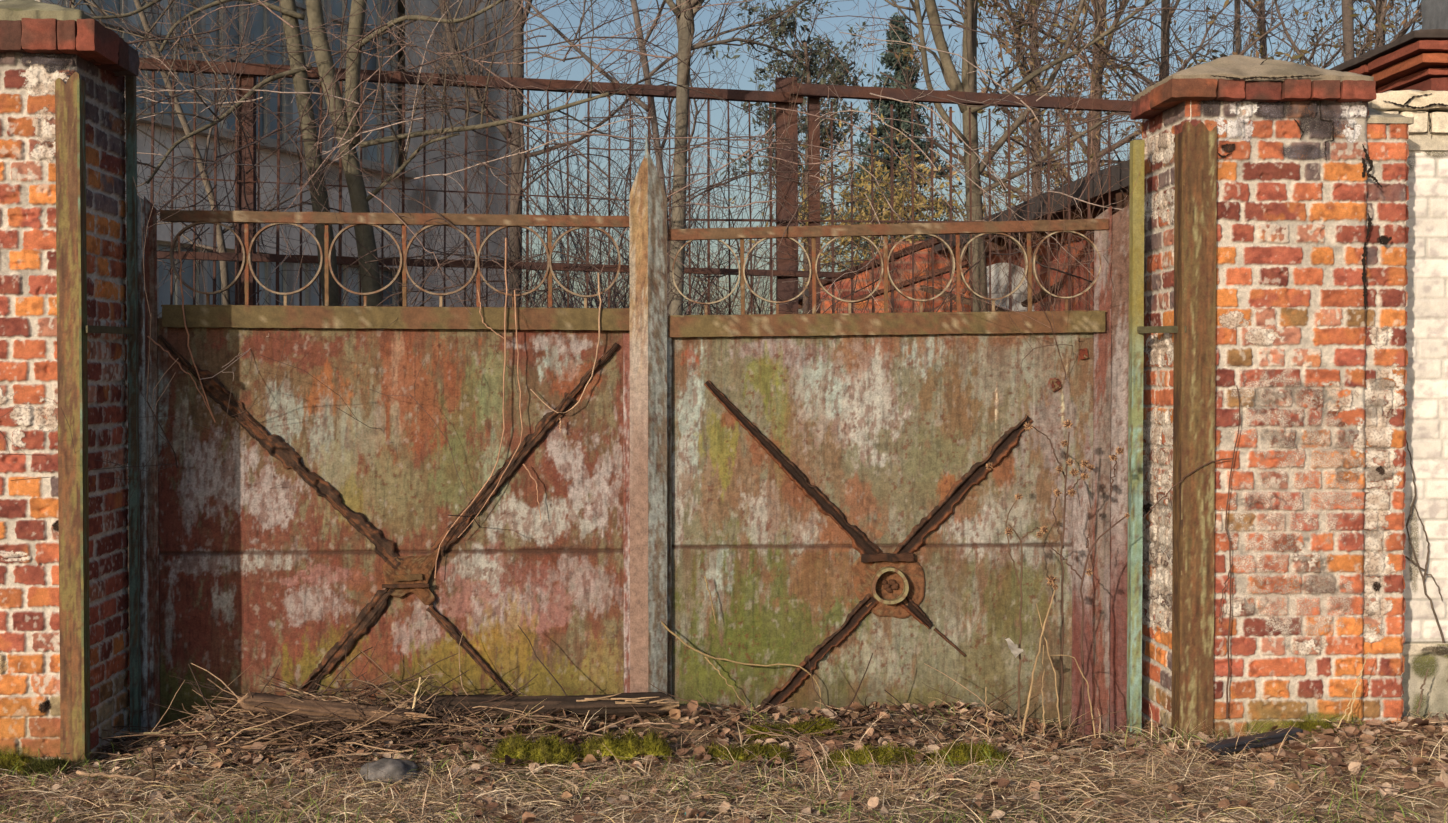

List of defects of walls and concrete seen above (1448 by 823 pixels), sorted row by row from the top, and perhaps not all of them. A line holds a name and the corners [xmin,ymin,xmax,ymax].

crack [1211,59,1392,309]